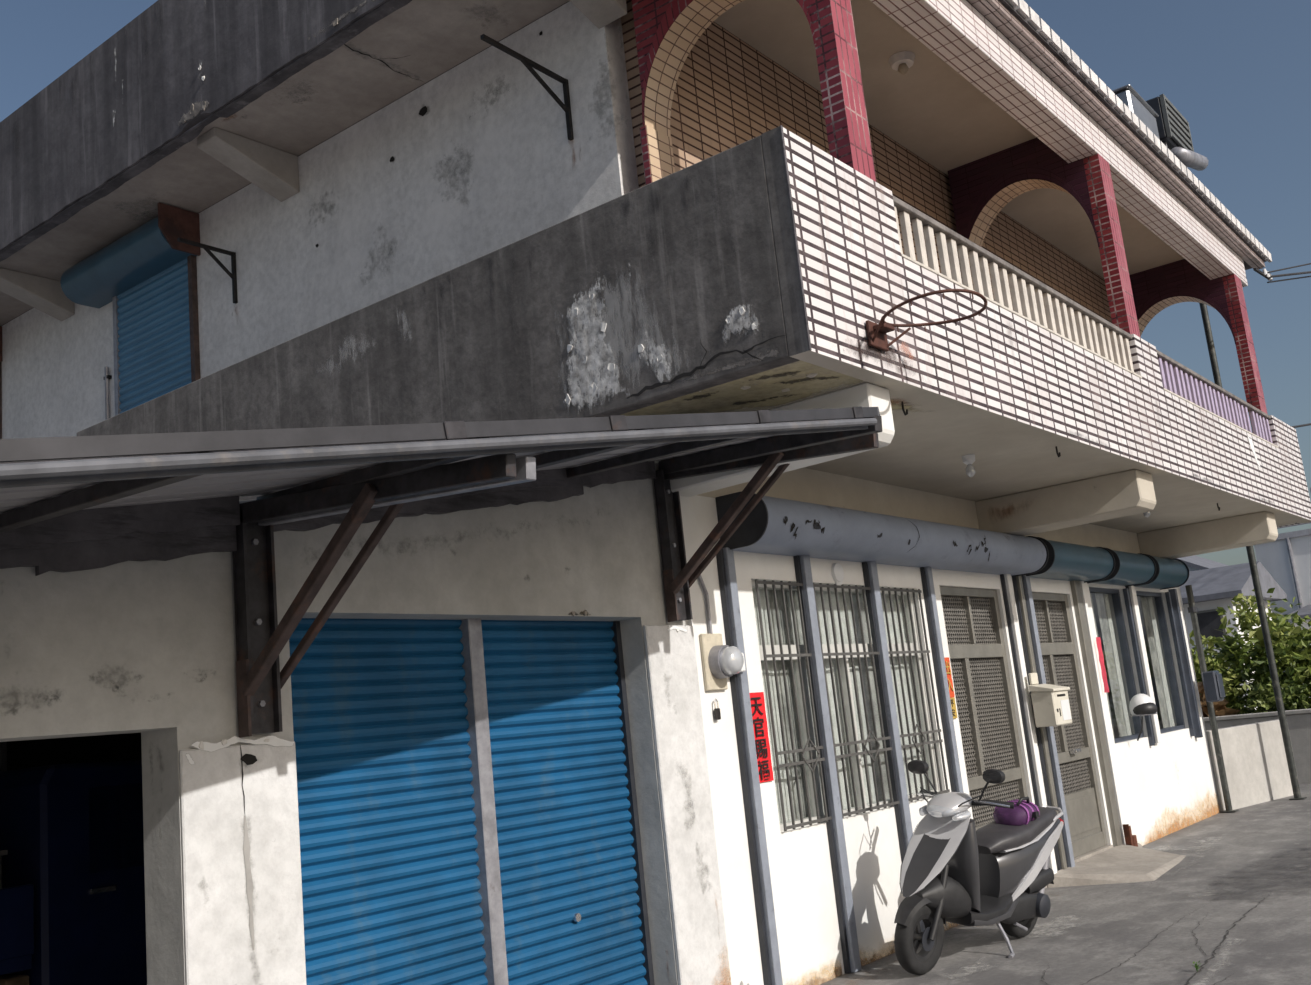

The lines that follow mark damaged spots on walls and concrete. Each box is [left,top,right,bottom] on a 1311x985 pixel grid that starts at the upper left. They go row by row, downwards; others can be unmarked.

crack [344,44,417,80]
peeling [562,277,625,411]
peeling [638,325,672,383]
crack [627,335,786,399]
peeling [723,305,759,339]
crack [243,816,254,950]
crack [1082,894,1270,985]